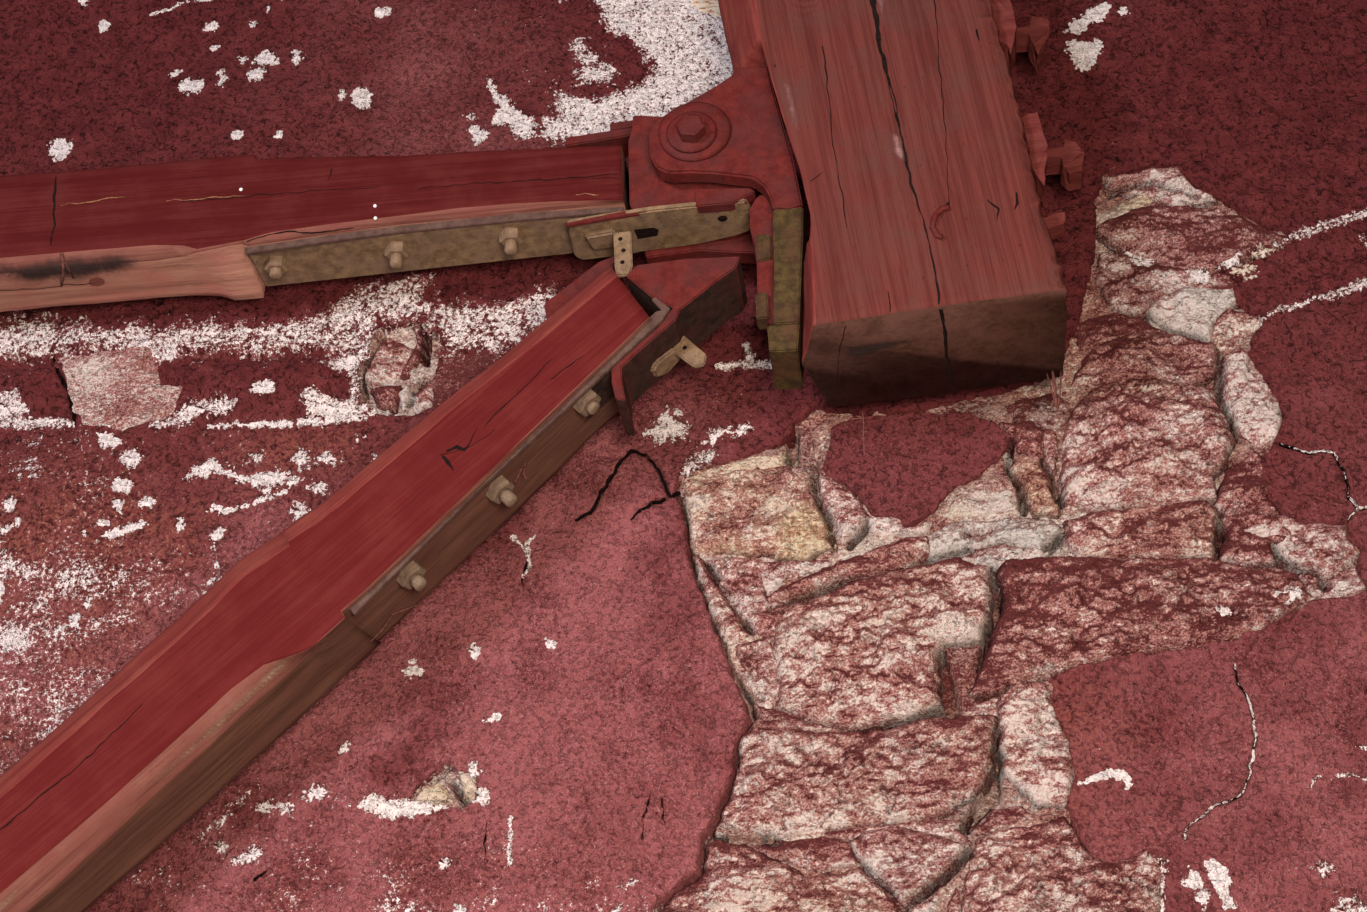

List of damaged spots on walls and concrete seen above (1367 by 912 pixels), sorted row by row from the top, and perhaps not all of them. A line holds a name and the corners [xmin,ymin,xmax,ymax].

peeling [0,271,564,586]
crack [575,449,681,521]
crack [1279,443,1367,525]
flaking render [642,167,1367,912]
peeling [401,658,425,680]
peeling [468,642,482,660]
peeling [544,637,558,649]
peeling [482,712,503,723]
crack [1184,662,1258,839]
peeling [348,761,490,821]
peeling [609,877,639,912]